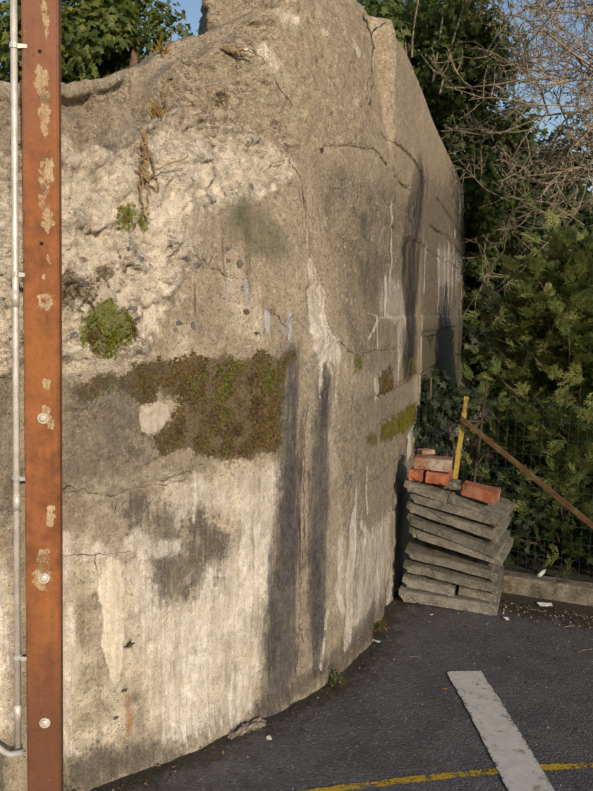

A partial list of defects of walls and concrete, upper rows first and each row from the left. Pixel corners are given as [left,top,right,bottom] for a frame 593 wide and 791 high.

crack [363,10,386,105]
crack [270,144,312,260]
crack [318,133,466,260]
water stain [403,159,426,461]
water stain [147,497,230,606]
water stain [257,266,398,718]